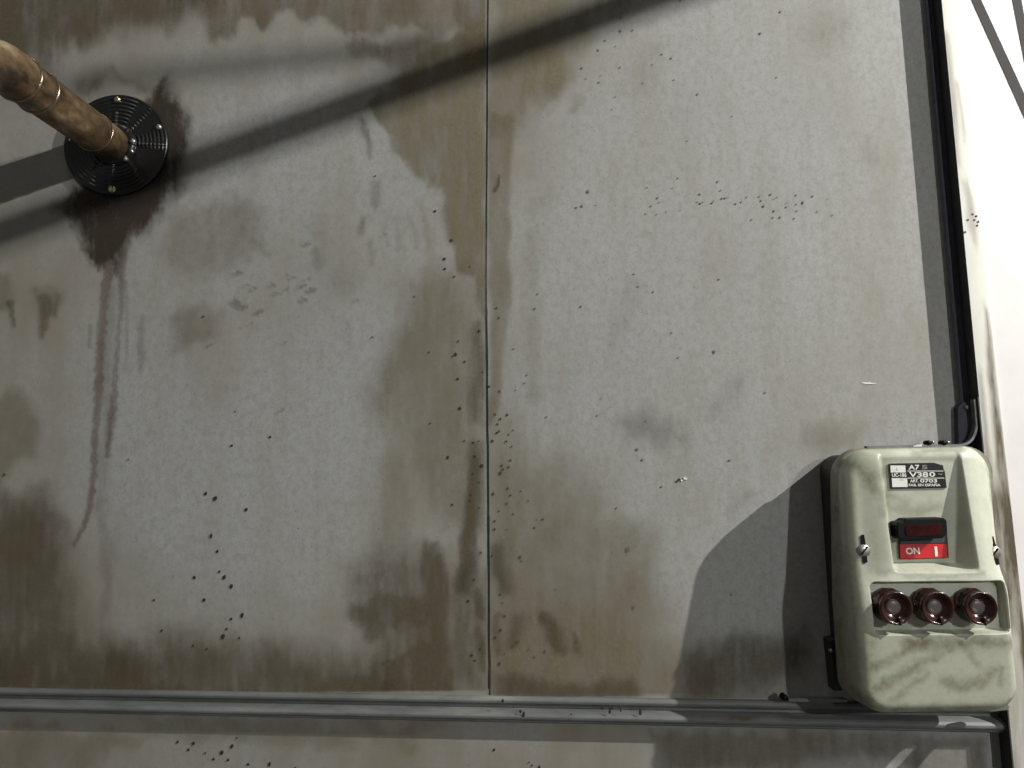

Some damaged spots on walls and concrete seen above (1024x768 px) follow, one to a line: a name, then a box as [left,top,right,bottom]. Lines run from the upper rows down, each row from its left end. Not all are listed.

leakage [0,0,236,56]
leakage [64,81,187,287]
leakage [370,0,499,289]
leakage [0,502,479,692]